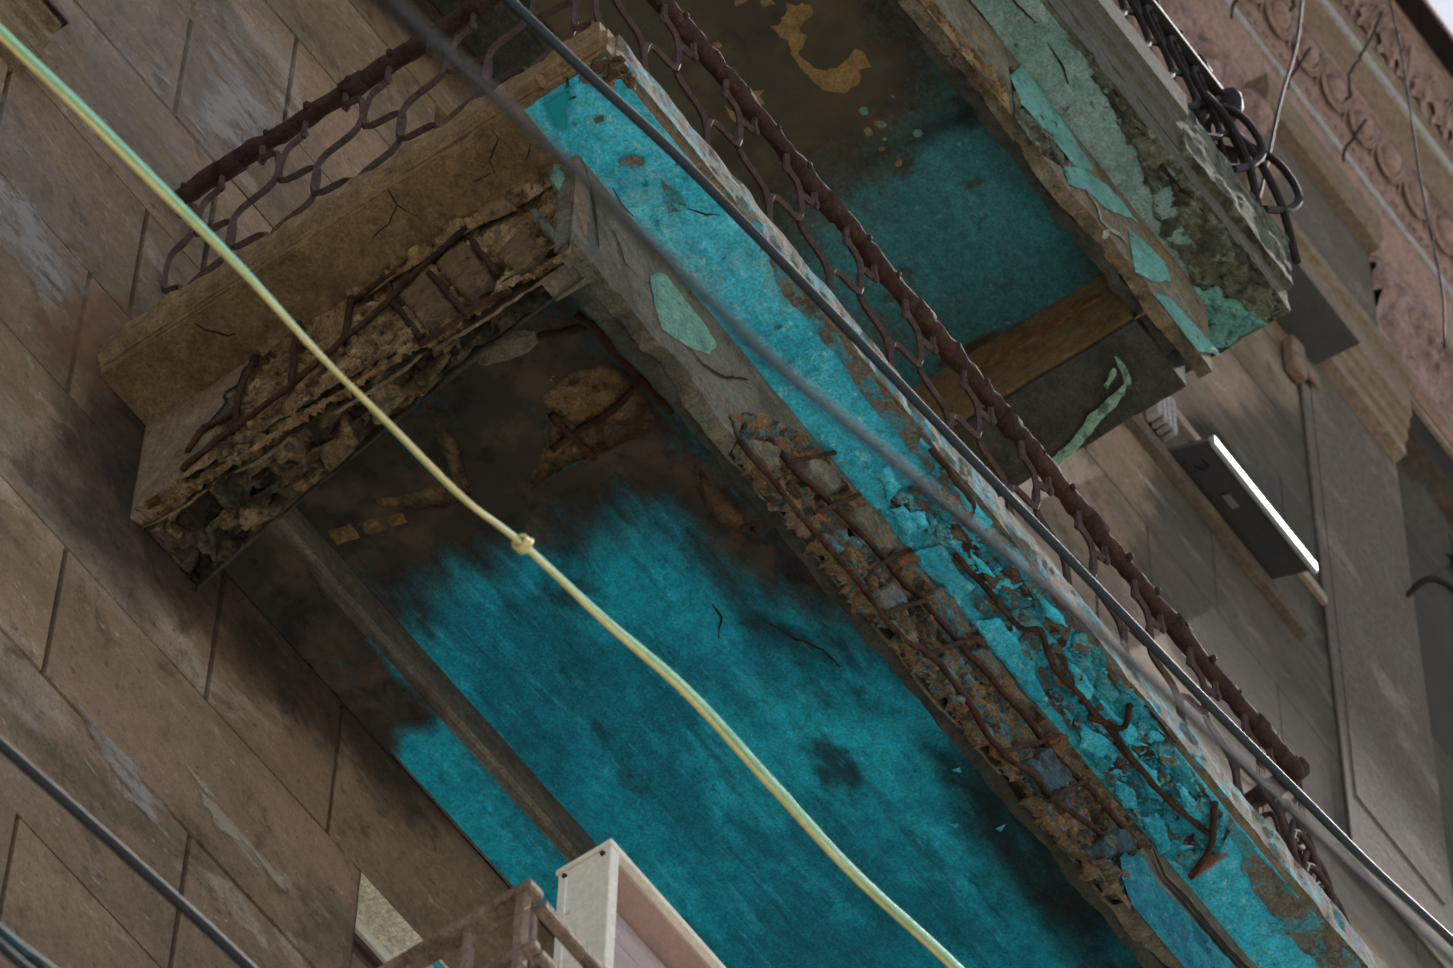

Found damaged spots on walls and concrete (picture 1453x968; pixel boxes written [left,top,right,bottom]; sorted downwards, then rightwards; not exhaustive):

peeling [734,0,872,93]
peeling [859,107,902,167]
spalling [917,0,1285,355]
flaking render [650,272,716,354]
spalling [134,163,675,566]
spalling [729,258,1364,968]
corrosion [1190,853,1226,879]